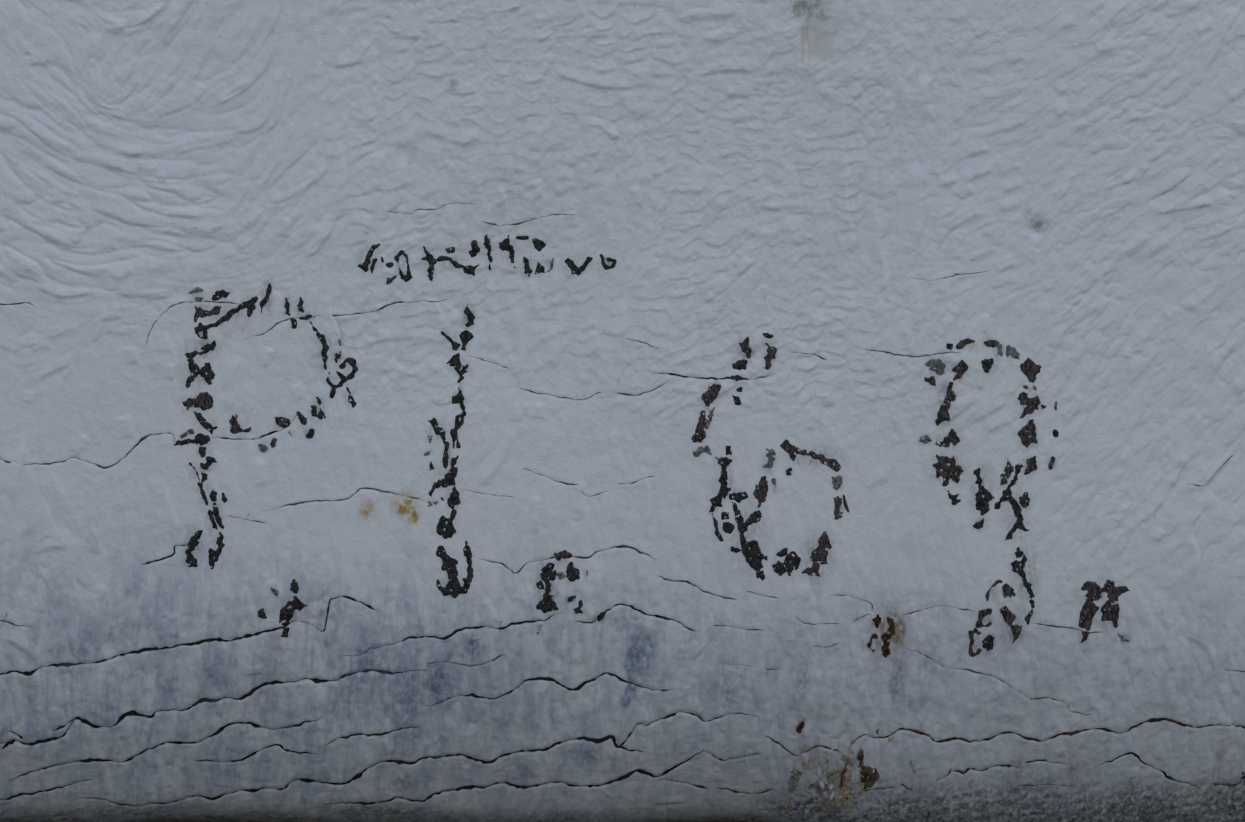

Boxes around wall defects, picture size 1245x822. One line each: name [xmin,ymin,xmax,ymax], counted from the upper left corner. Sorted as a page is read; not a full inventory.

crack [0,545,1245,806]
corrosion [867,614,903,658]